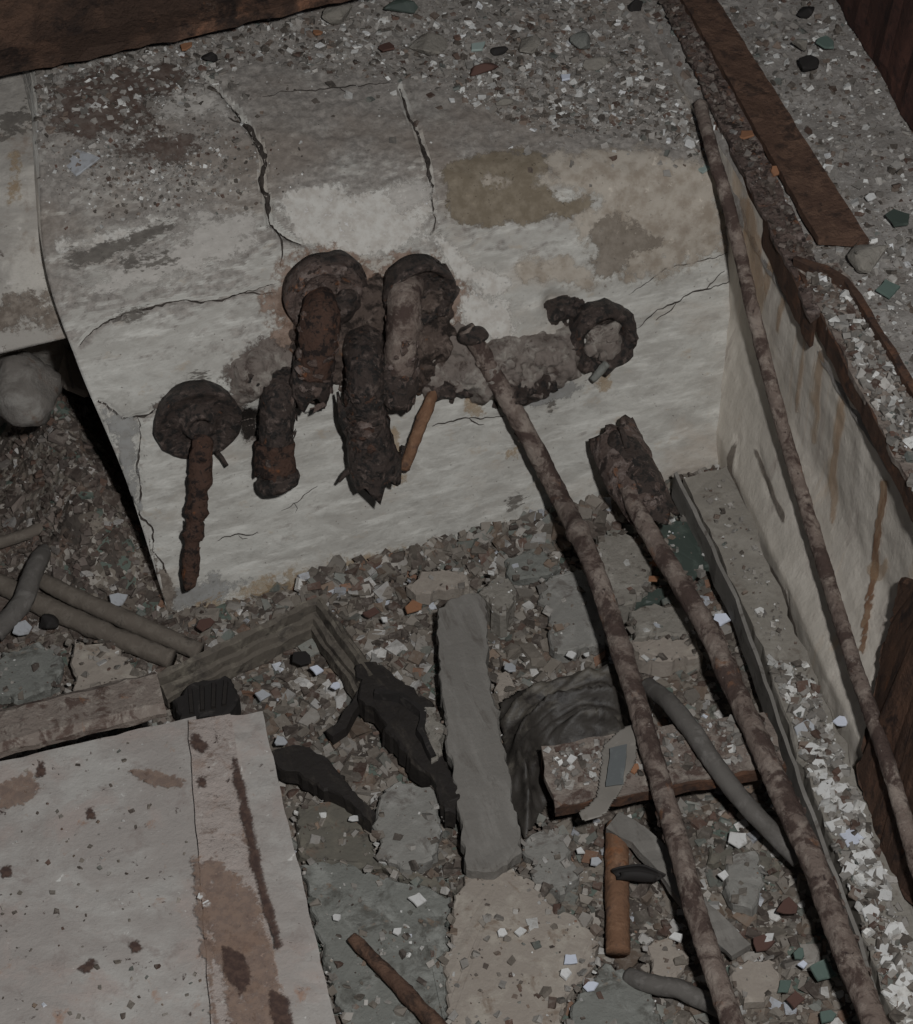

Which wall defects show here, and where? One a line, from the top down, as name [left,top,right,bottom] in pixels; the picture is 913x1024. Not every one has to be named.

crack [263,82,436,236]
crack [80,91,301,345]
corrosion [258,242,412,350]
corrosion [451,271,472,326]
leakage [515,212,663,290]
crack [629,252,729,328]
corrosion [859,480,887,653]